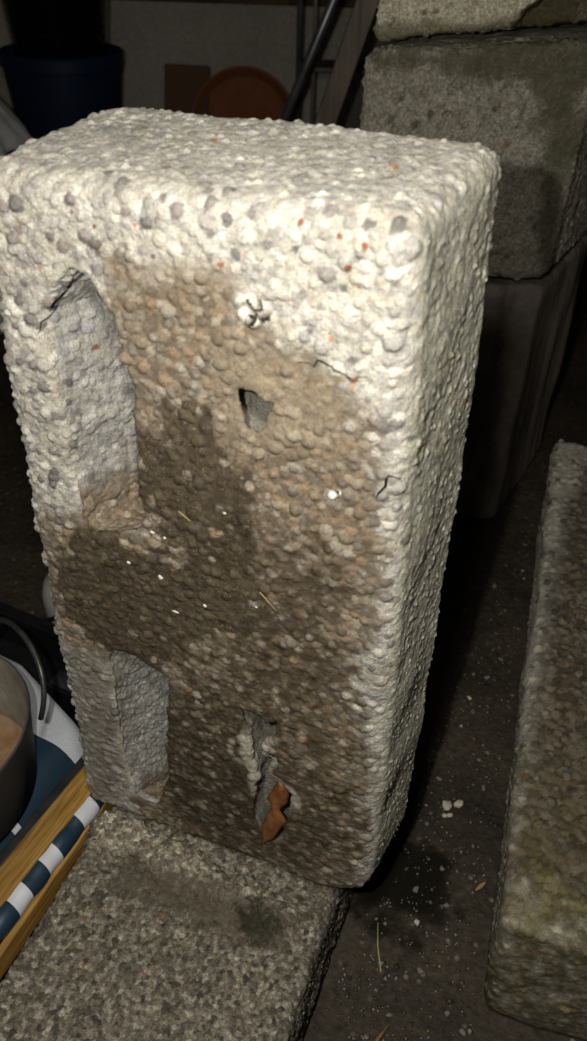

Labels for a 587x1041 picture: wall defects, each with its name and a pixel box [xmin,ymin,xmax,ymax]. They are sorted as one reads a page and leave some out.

spalling [512,0,587,28]
crack [36,272,111,336]
leakage [238,293,272,327]
crack [298,359,359,379]
spalling [36,267,139,526]
spalling [239,388,274,433]
crack [376,475,401,497]
spalling [108,649,170,804]
spalling [237,709,301,842]